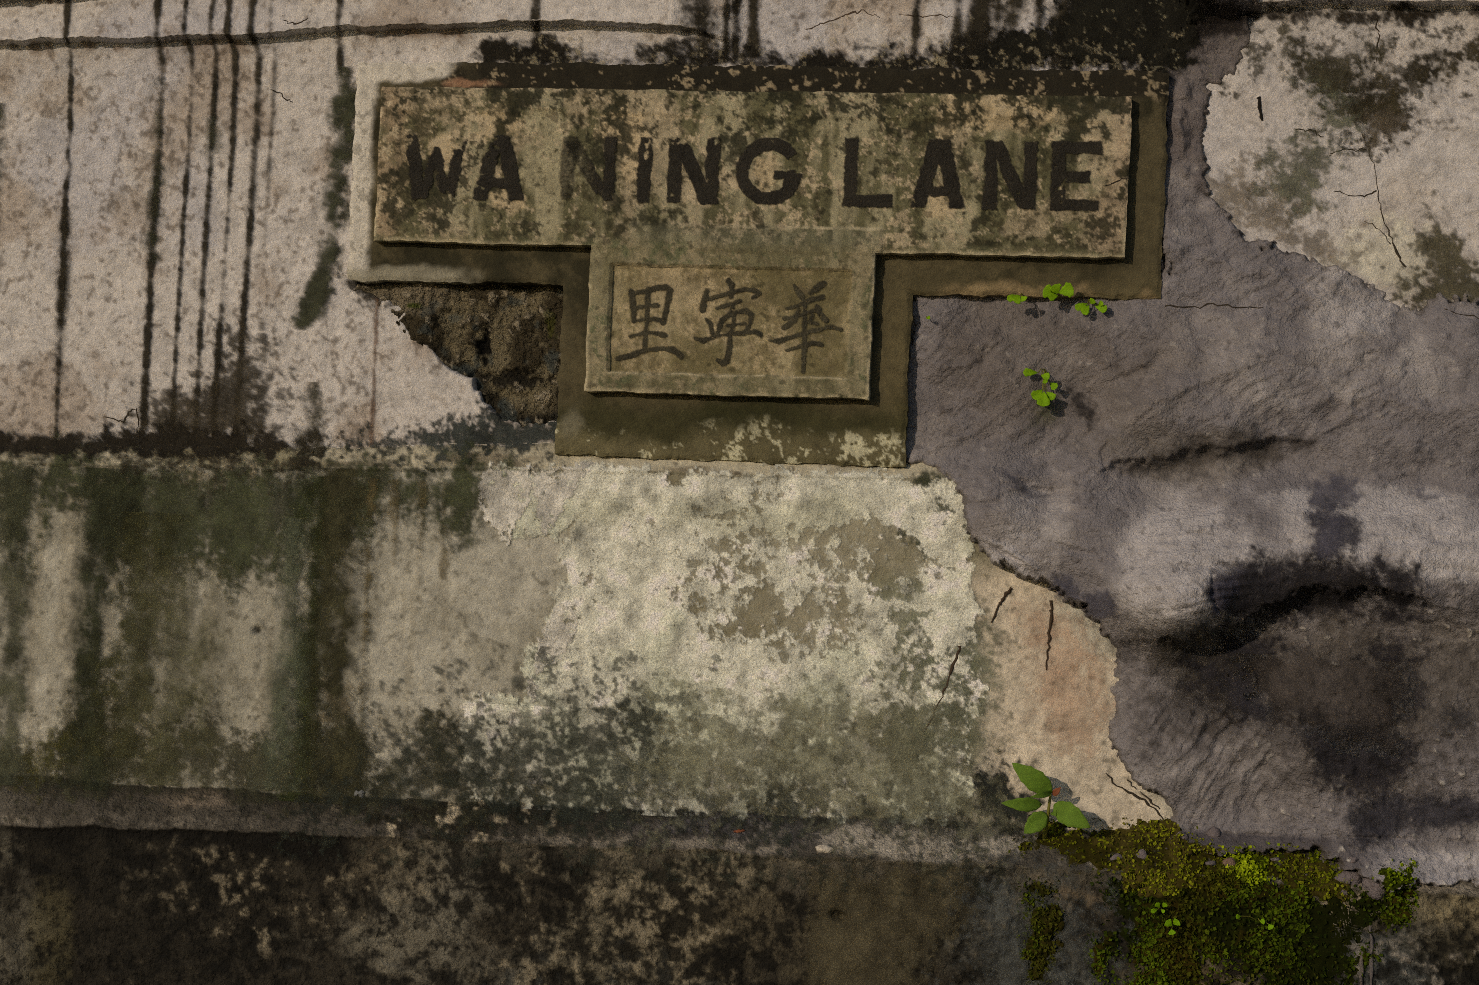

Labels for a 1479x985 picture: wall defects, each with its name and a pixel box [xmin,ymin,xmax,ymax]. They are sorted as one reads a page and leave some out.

leakage [622,0,1479,263]
crack [1295,128,1407,268]
leakage [1382,216,1479,310]
spalling [353,282,563,427]
leakage [0,0,1044,896]
leakage [1068,388,1094,420]
leakage [1177,474,1479,849]